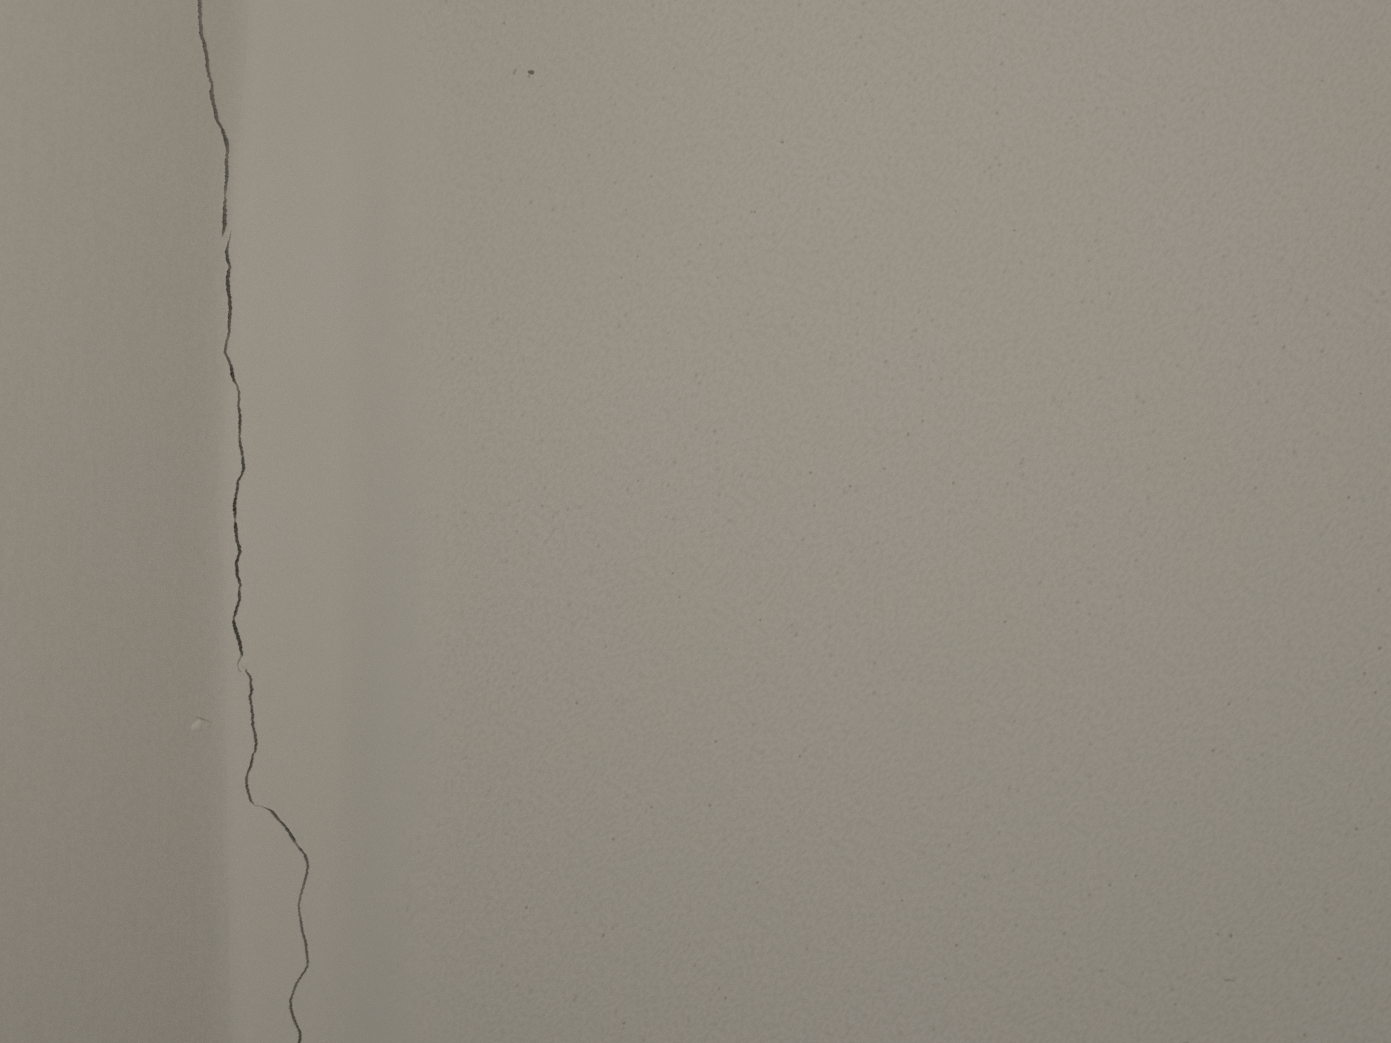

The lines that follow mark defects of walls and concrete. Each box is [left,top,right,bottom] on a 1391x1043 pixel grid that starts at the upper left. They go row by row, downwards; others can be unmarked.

crack [195,0,311,1043]